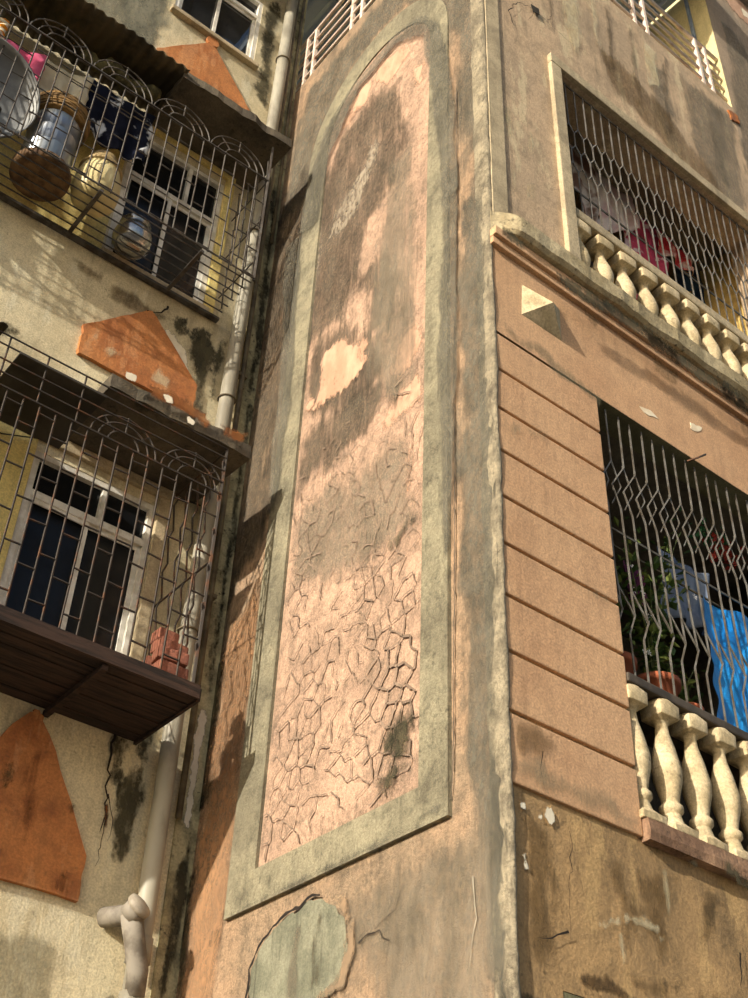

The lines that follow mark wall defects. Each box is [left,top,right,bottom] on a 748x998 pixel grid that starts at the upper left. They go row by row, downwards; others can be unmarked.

water stain [86,0,168,44]
peeling [727,0,748,24]
water stain [602,25,748,207]
crack [452,88,460,290]
water stain [556,272,748,413]
water stain [159,0,506,998]
crack [261,355,422,860]
crack [449,391,457,799]
crack [95,734,116,866]
water stain [111,734,153,862]
peeling [539,807,555,825]
spalling [245,893,355,998]